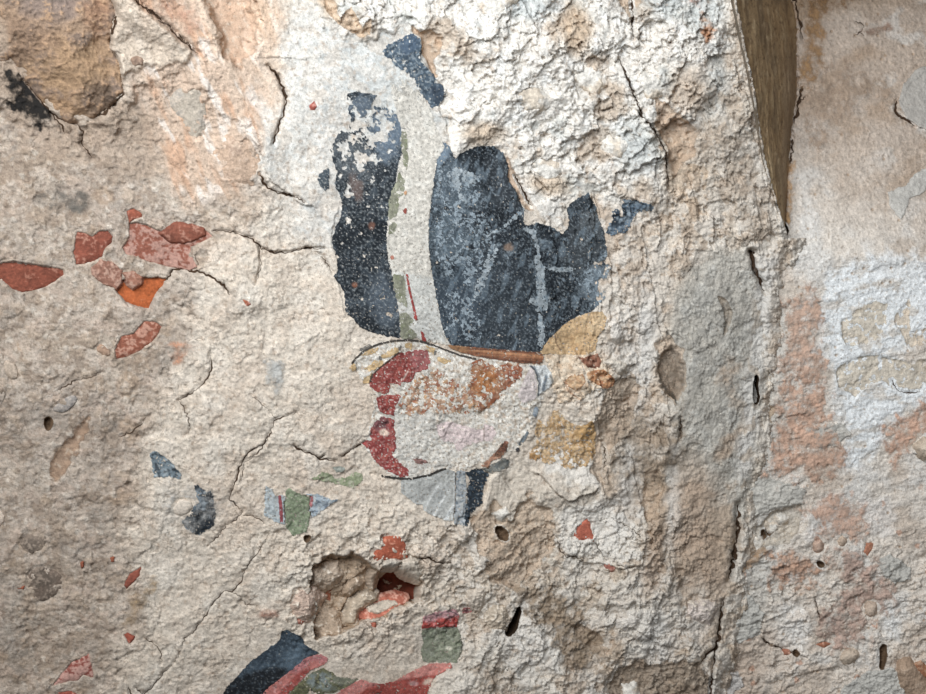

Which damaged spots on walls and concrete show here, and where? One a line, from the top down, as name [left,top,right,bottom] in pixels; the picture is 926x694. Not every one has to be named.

crack [135,0,197,53]
crack [23,80,125,156]
crack [269,66,288,144]
flaking render [314,0,740,232]
crack [619,59,669,187]
crack [259,175,305,203]
crack [166,257,230,295]
crack [213,230,332,278]
crack [728,504,741,577]
flaking render [310,552,402,639]
crack [701,601,724,694]